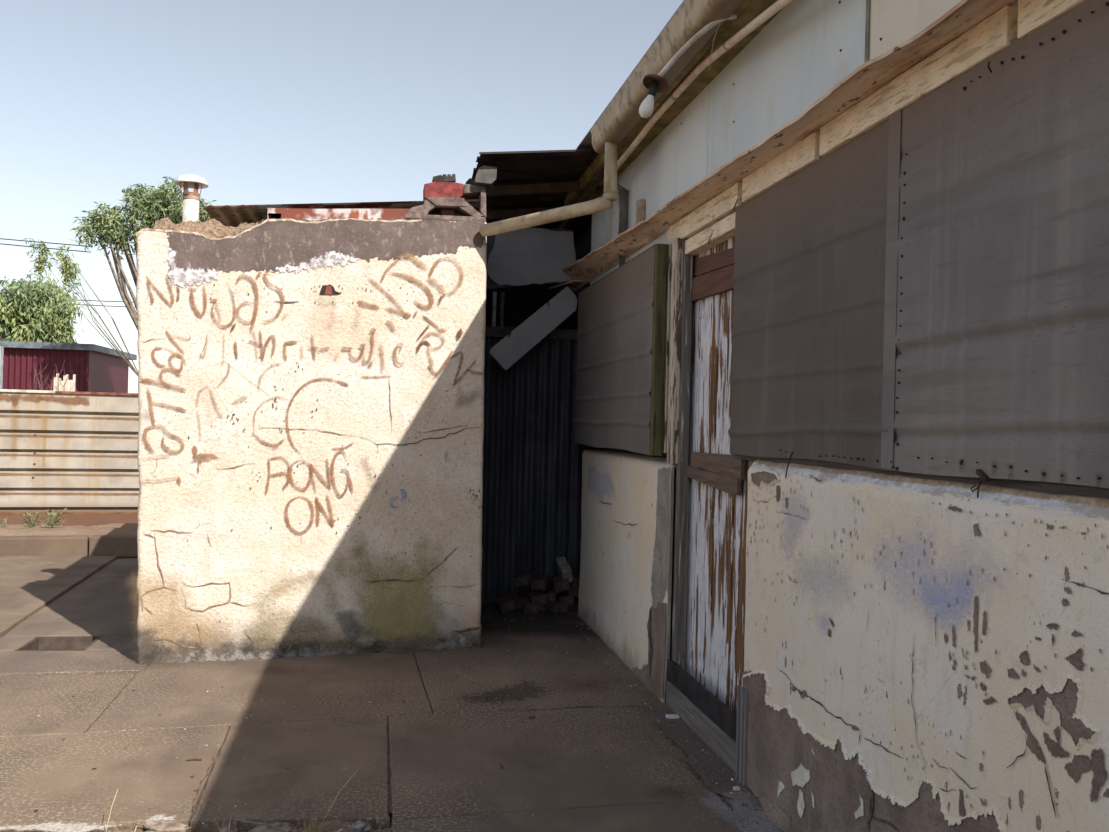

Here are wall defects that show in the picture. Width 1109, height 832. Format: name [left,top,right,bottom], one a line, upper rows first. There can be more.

peeling [136,216,487,300]
crack [256,382,480,448]
peeling [932,502,1014,537]
crack [141,530,257,648]
crack [365,547,481,634]
spalling [633,467,670,699]
crack [1062,578,1109,595]
peeling [944,568,1109,802]
peeling [741,669,1007,832]